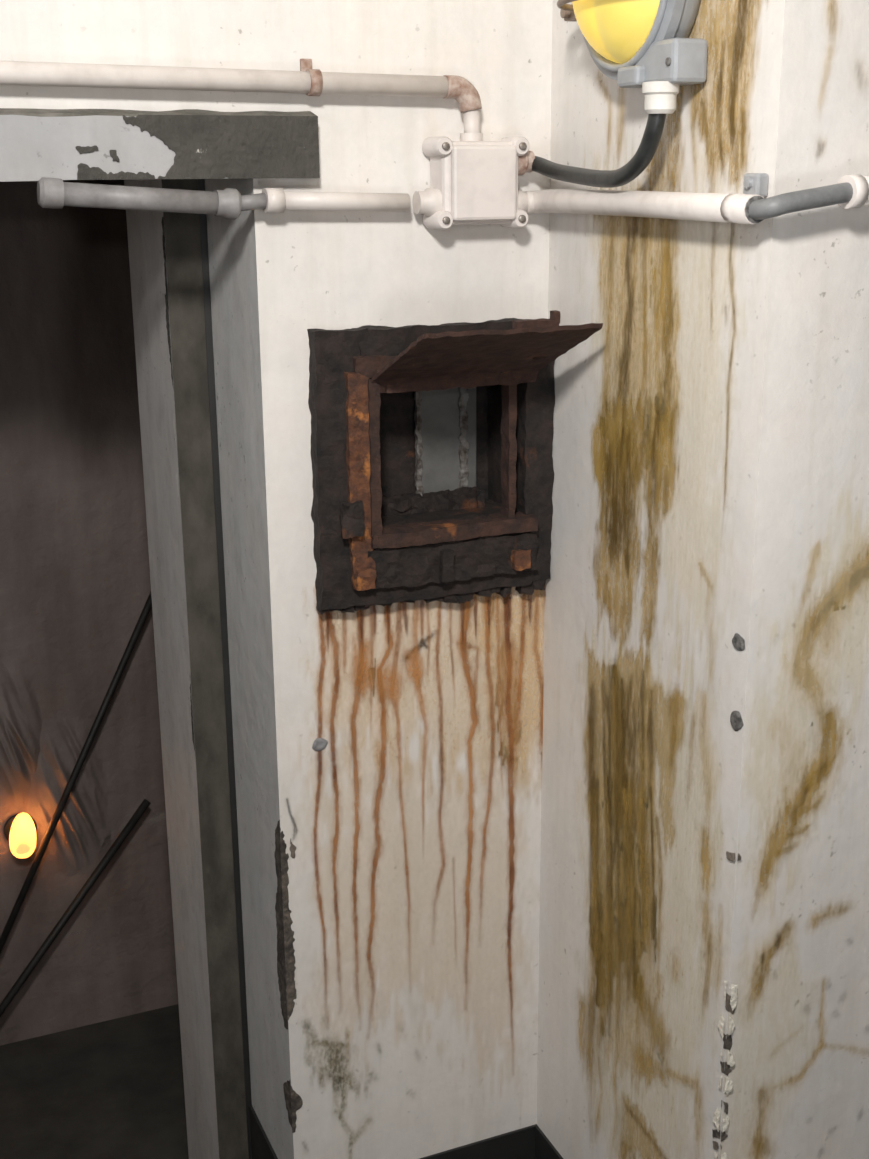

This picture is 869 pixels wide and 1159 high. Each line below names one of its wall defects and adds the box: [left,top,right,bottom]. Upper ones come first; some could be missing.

peeling [75,115,320,180]
leakage [637,0,759,191]
leakage [579,216,684,1073]
leakage [793,553,869,699]
rust [314,600,426,972]
rust [436,604,445,888]
rust [460,582,546,1009]
leakage [759,711,841,887]
spalling [274,820,297,1029]
leakage [753,923,789,997]
spalling [283,1080,303,1133]